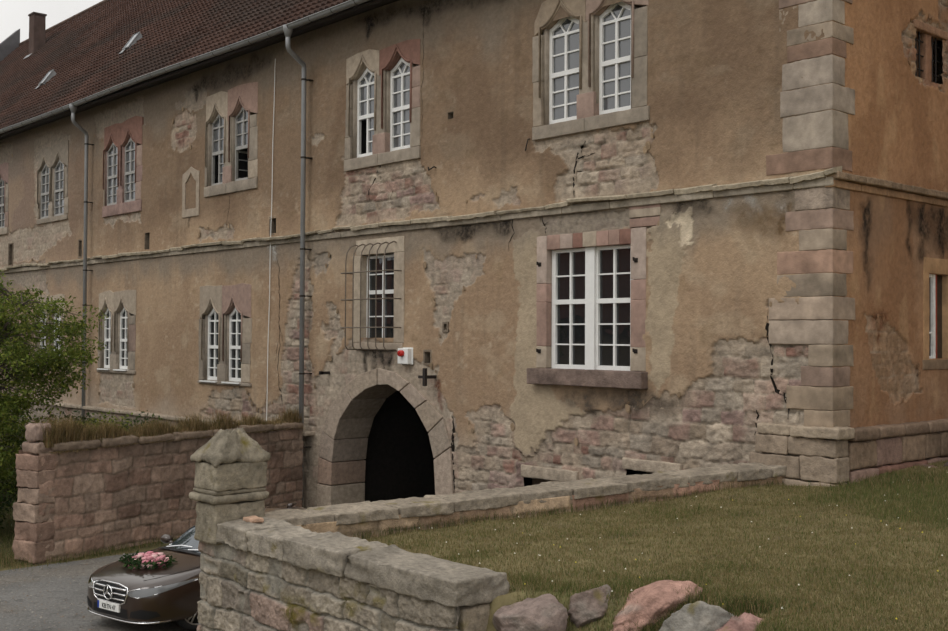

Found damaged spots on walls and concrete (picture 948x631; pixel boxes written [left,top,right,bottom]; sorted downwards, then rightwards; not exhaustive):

spalling [172,88,207,152]
spalling [335,159,439,226]
spalling [535,121,659,202]
spalling [542,208,693,245]
spalling [200,248,823,507]
crack [765,313,790,415]